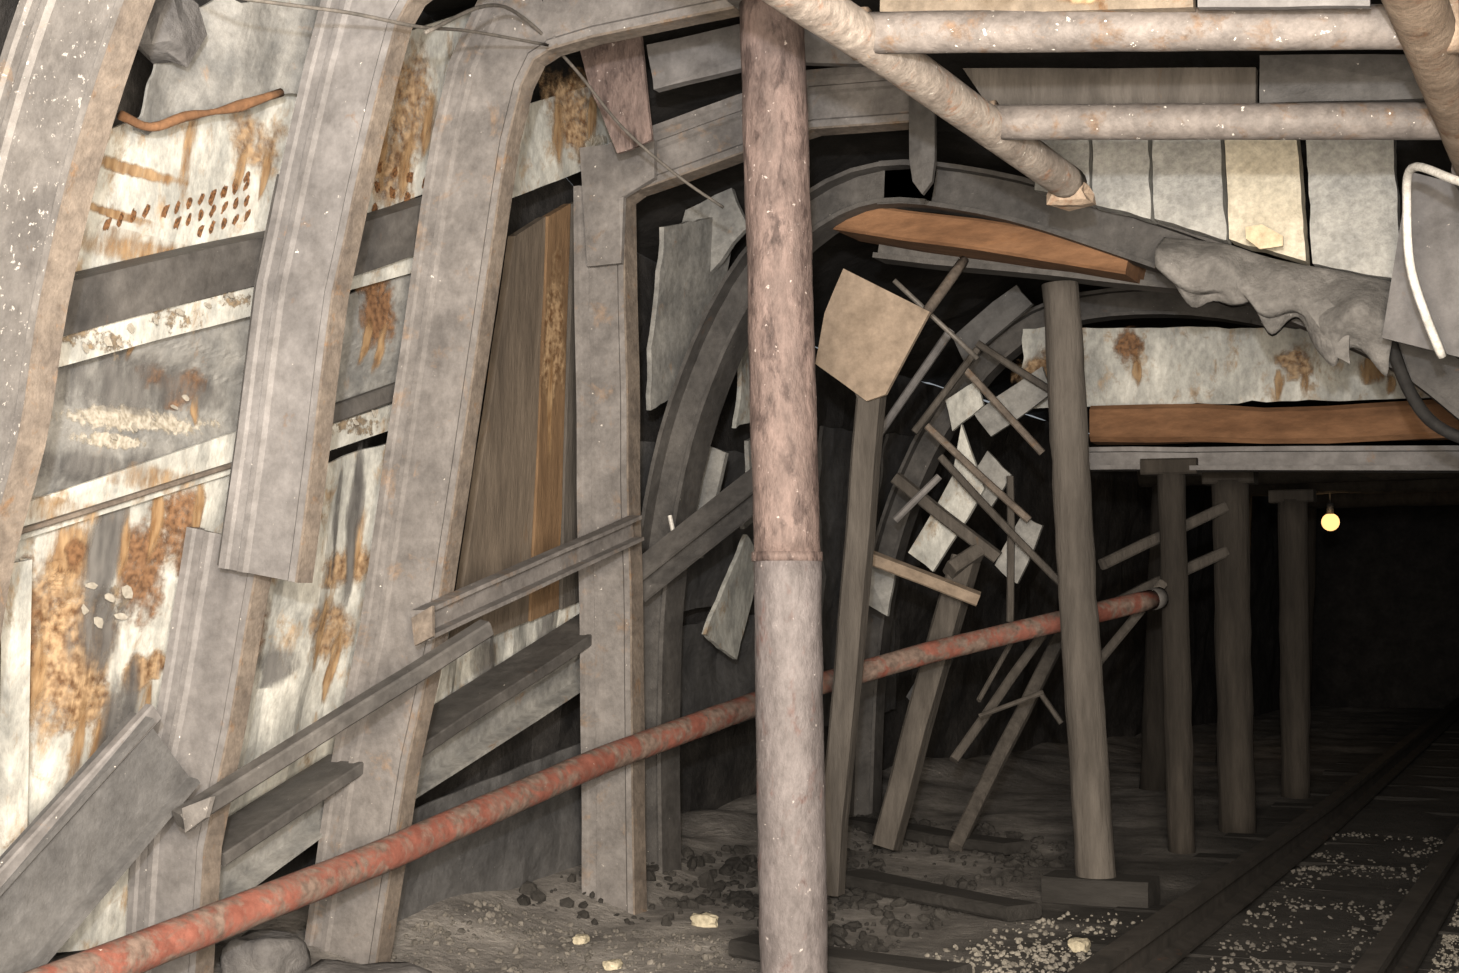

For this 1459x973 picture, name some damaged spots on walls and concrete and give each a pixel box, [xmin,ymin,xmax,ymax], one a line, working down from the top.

corrosion [101,120,195,184]
corrosion [373,55,435,207]
corrosion [82,203,175,260]
corrosion [359,280,395,369]
corrosion [28,498,166,776]
corrosion [112,469,205,643]
corrosion [310,515,370,701]